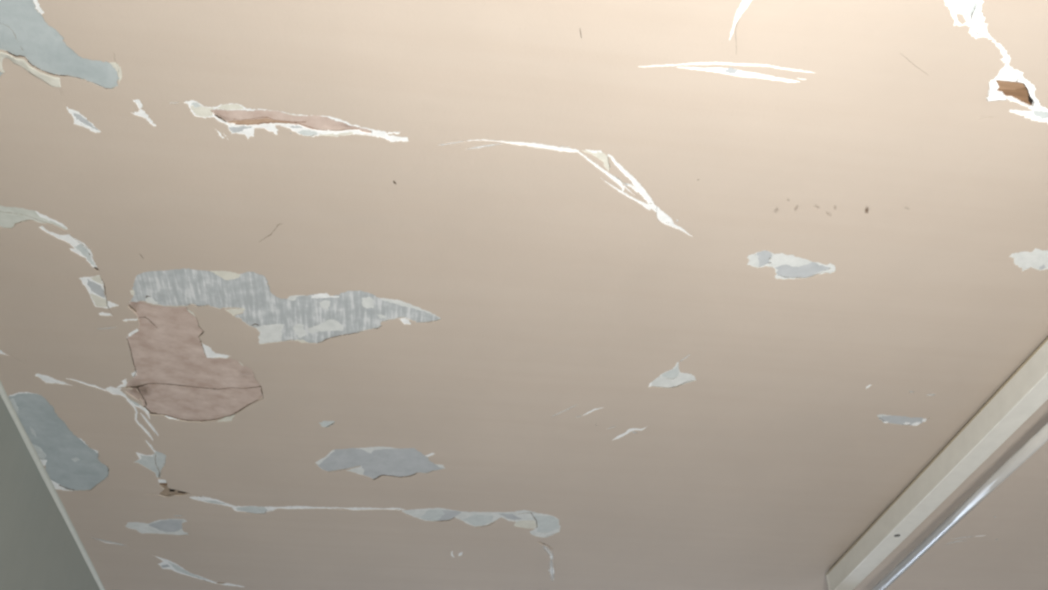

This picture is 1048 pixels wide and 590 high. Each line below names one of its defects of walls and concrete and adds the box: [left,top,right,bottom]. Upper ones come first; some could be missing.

peeling [0,0,122,89]
crack [638,0,815,83]
crack [944,0,1048,123]
spalling [184,100,408,142]
crack [442,139,693,237]
peeling [747,250,836,280]
peeling [1009,248,1048,271]
peeling [0,206,441,422]
peeling [648,355,696,388]
peeling [8,392,109,491]
peeling [401,508,561,538]
crack [155,556,244,587]